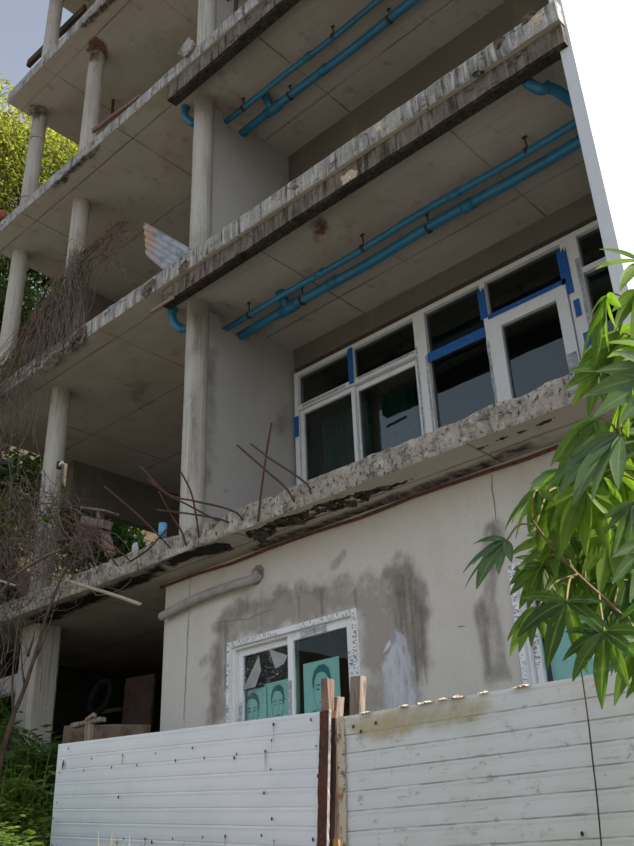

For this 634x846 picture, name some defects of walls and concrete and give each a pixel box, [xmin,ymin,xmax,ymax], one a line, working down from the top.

corrosion [87,37,107,61]
spalling [341,169,358,186]
spalling [246,478,413,543]
water stain [215,566,425,697]
corrosion [310,710,362,846]